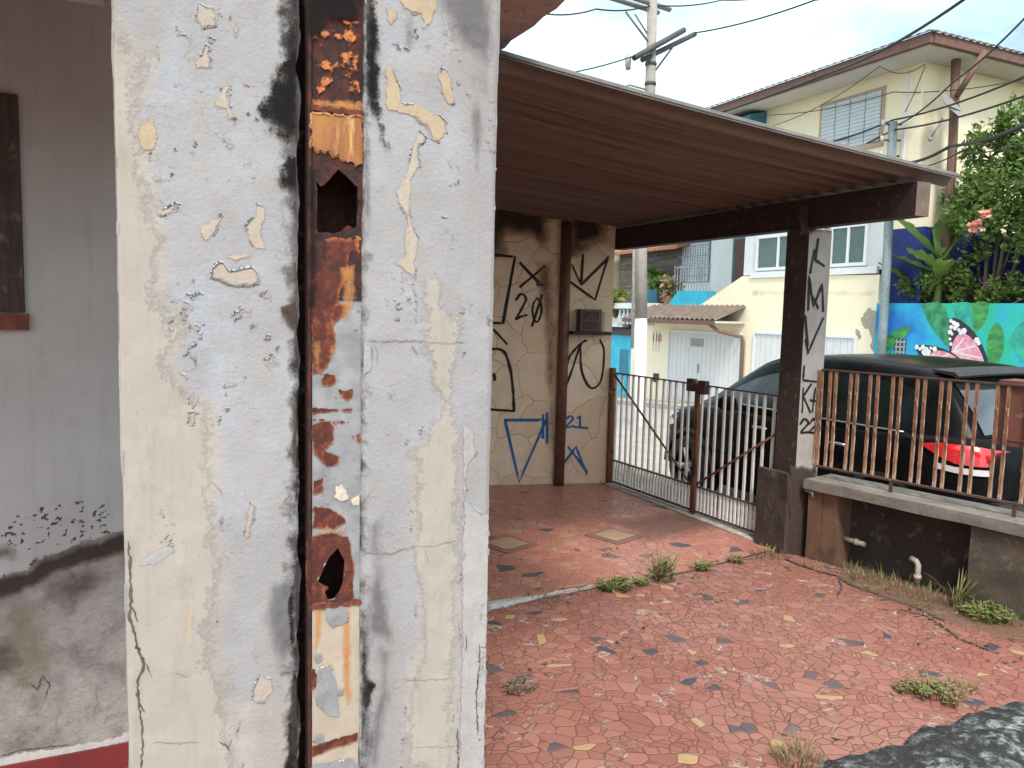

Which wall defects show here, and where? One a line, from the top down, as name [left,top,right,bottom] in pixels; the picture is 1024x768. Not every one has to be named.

damp [257,0,390,209]
corrosion [313,20,362,110]
peeling [365,0,437,51]
peeling [209,203,271,301]
peeling [0,32,246,768]
corrosion [311,236,361,466]
peeling [383,66,490,768]
damp [0,533,124,598]
corrosion [306,478,355,646]
crack [127,542,232,768]
corrosion [311,732,358,757]
corrosion [343,623,351,699]